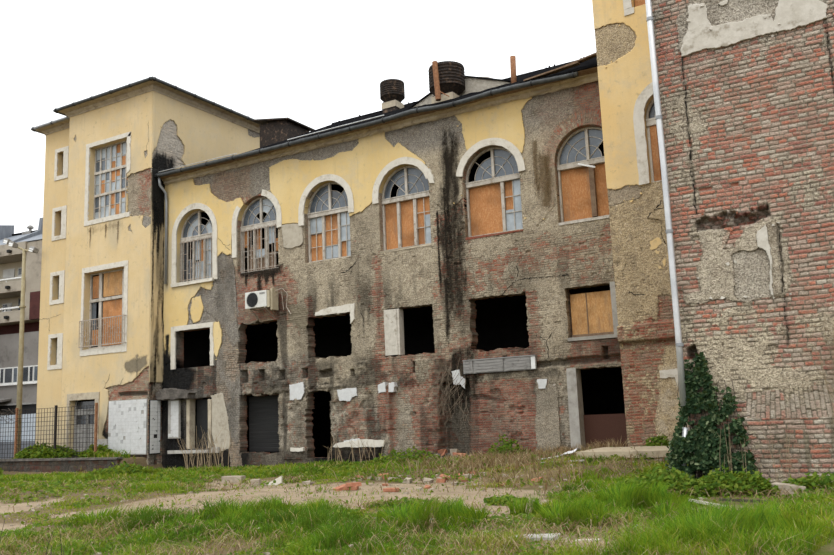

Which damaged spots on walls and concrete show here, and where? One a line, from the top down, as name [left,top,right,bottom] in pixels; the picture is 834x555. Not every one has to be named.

spalling [595,23,637,68]
spalling [675,0,780,55]
spalling [127,120,186,233]
spalling [193,139,359,202]
spalling [382,116,467,212]
spalling [521,81,602,226]
leakage [436,131,467,335]
peeling [650,237,669,269]
spalling [683,207,792,305]
spalling [654,294,673,319]
spalling [103,367,152,439]
spalling [193,252,248,467]